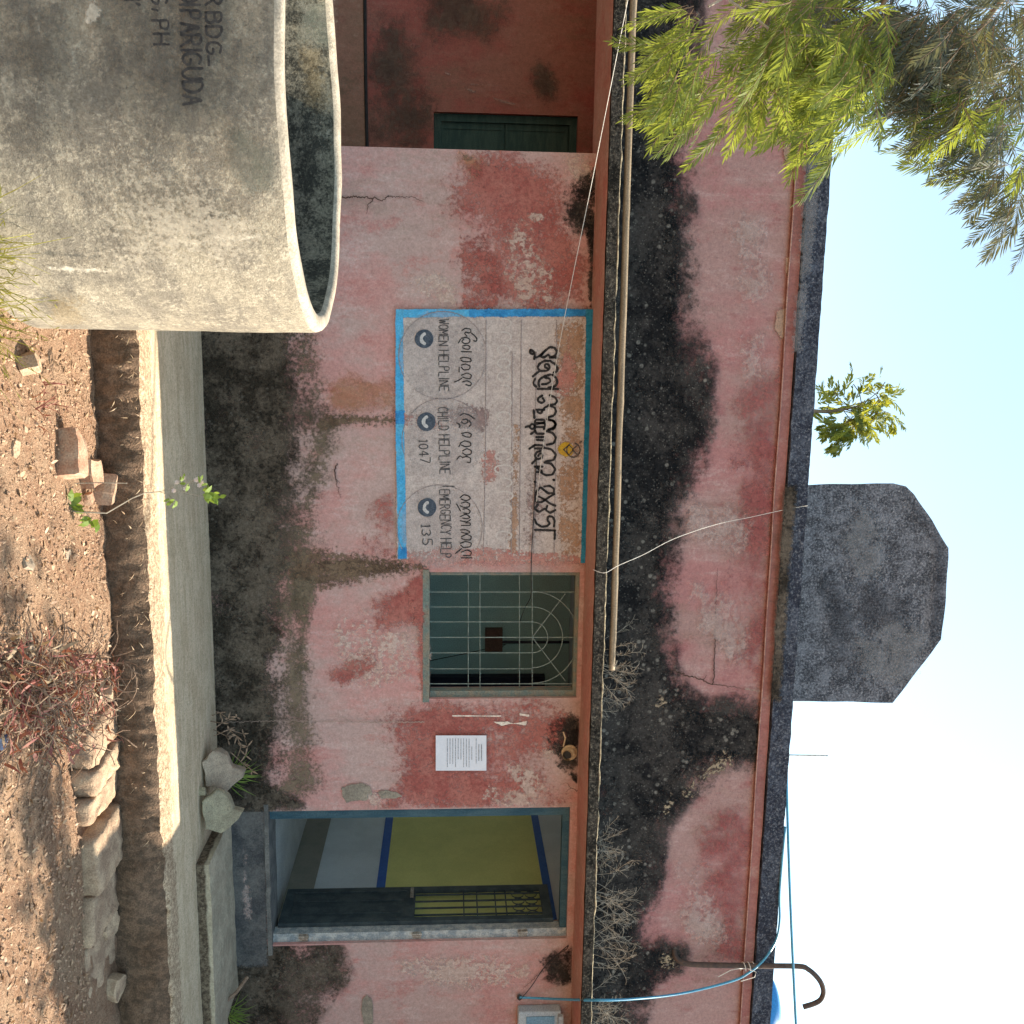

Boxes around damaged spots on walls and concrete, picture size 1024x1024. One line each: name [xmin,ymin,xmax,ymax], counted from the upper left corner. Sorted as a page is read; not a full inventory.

crack [341,195,422,214]
peeling [411,150,588,310]
water stain [591,0,760,1024]
water stain [201,331,430,1024]
peeling [342,698,567,809]
crack [669,568,761,692]